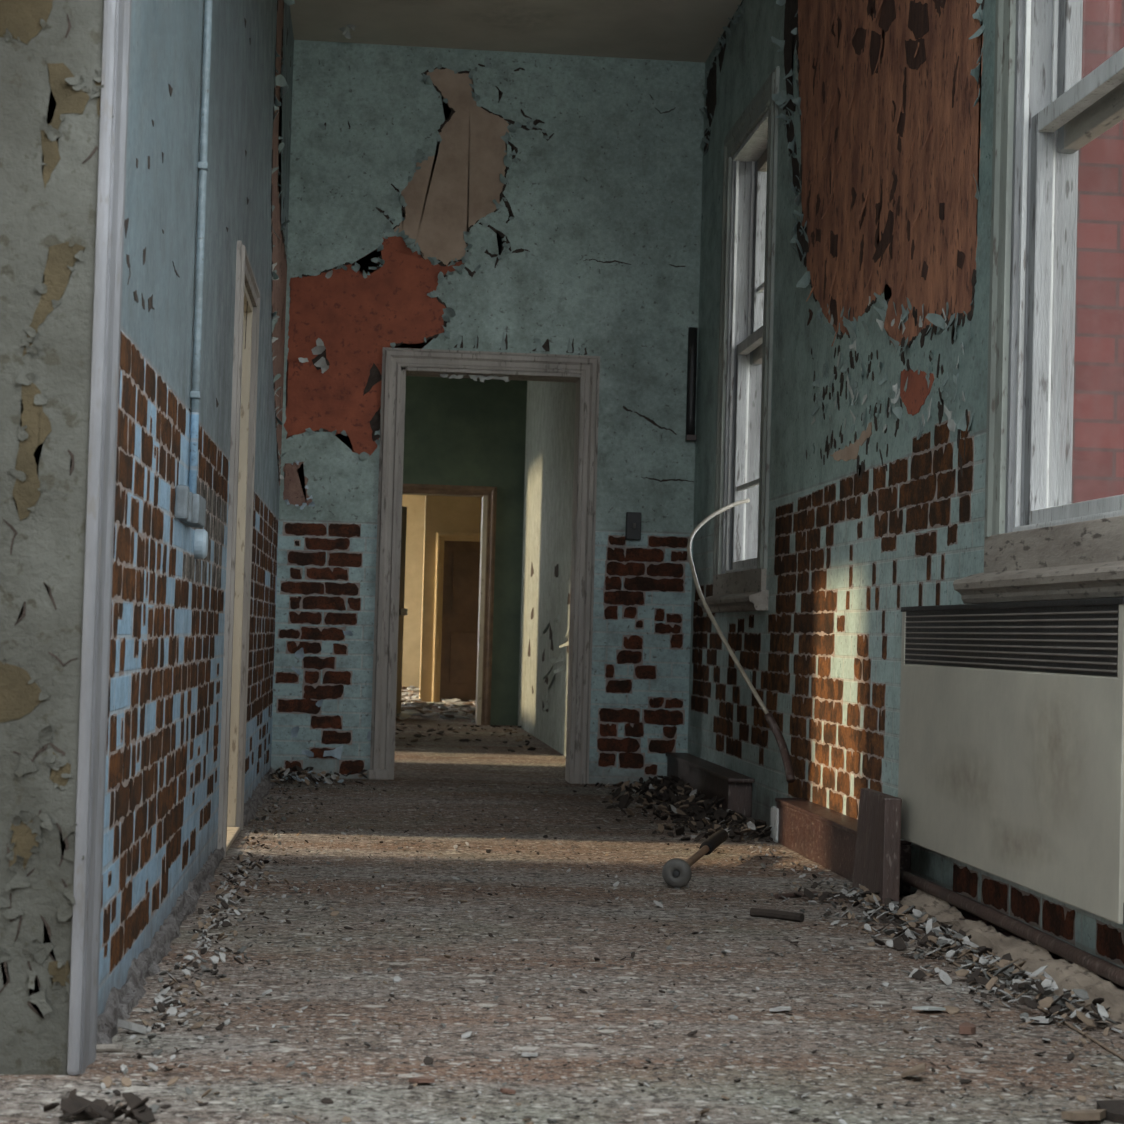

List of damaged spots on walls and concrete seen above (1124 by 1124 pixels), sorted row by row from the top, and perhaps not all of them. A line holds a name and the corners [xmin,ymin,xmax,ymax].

peeling [0,0,53,44]
peeling [40,63,114,187]
peeling [20,240,86,357]
peeling [9,371,52,521]
peeling [245,0,554,775]
peeling [597,0,985,820]
peeling [0,658,49,722]
peeling [101,330,228,974]
peeling [42,752,73,790]
peeling [48,959,70,993]